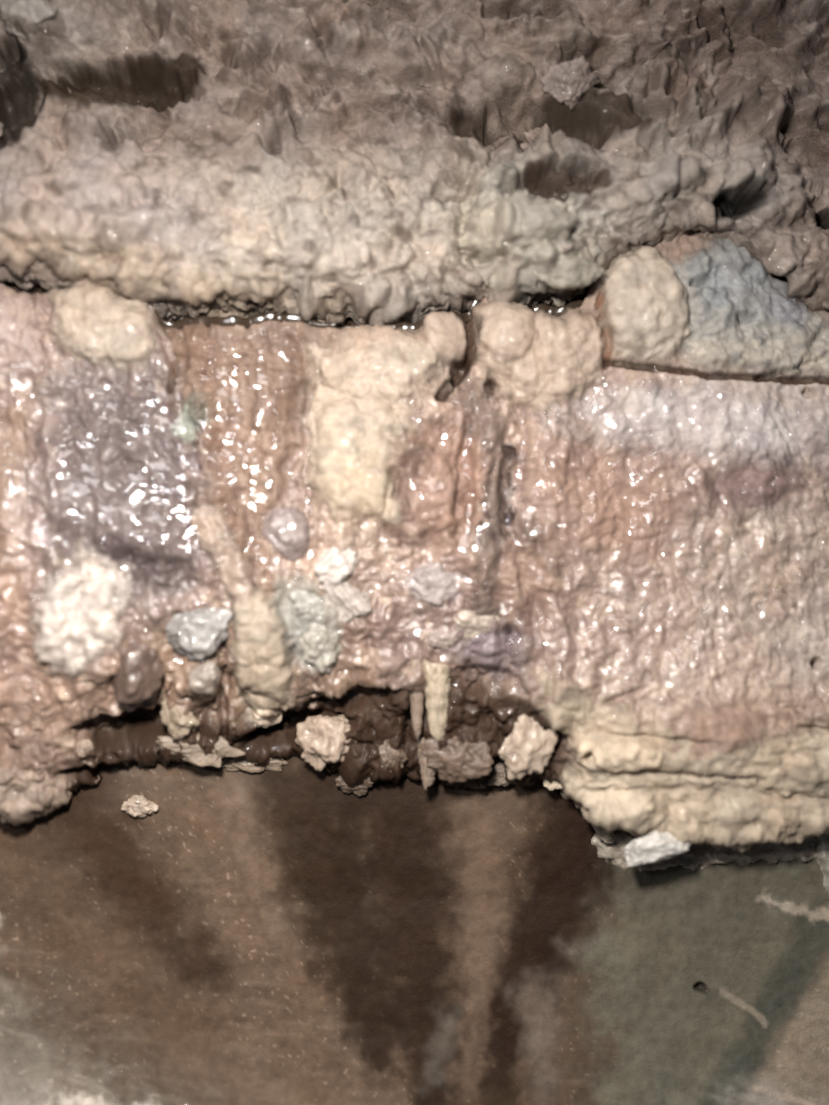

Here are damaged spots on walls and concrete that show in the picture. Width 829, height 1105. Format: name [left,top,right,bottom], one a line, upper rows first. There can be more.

damp [586,389,829,458]
damp [55,372,212,590]
damp [270,583,336,664]
damp [458,616,525,674]
damp [771,600,829,675]
peeling [540,673,829,894]
damp [0,682,829,1105]